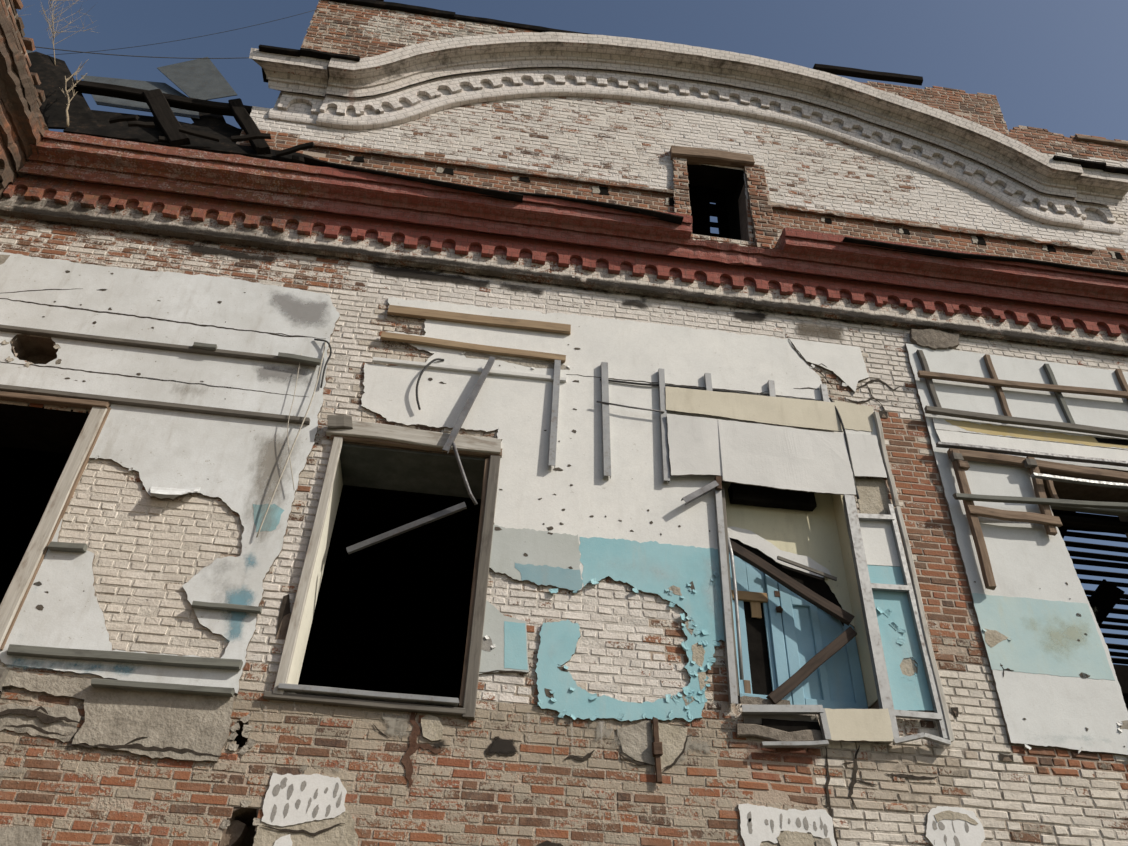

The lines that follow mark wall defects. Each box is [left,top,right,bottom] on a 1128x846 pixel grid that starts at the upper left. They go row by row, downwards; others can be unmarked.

spalling [1,334,62,367]
crack [567,339,901,412]
flaking render [810,364,851,401]
flaking render [58,455,243,658]
spalling [275,594,291,640]
flaking render [477,572,735,721]
spalling [228,714,256,755]
crack [373,712,444,787]
flaking render [239,773,347,846]
crack [823,745,938,846]